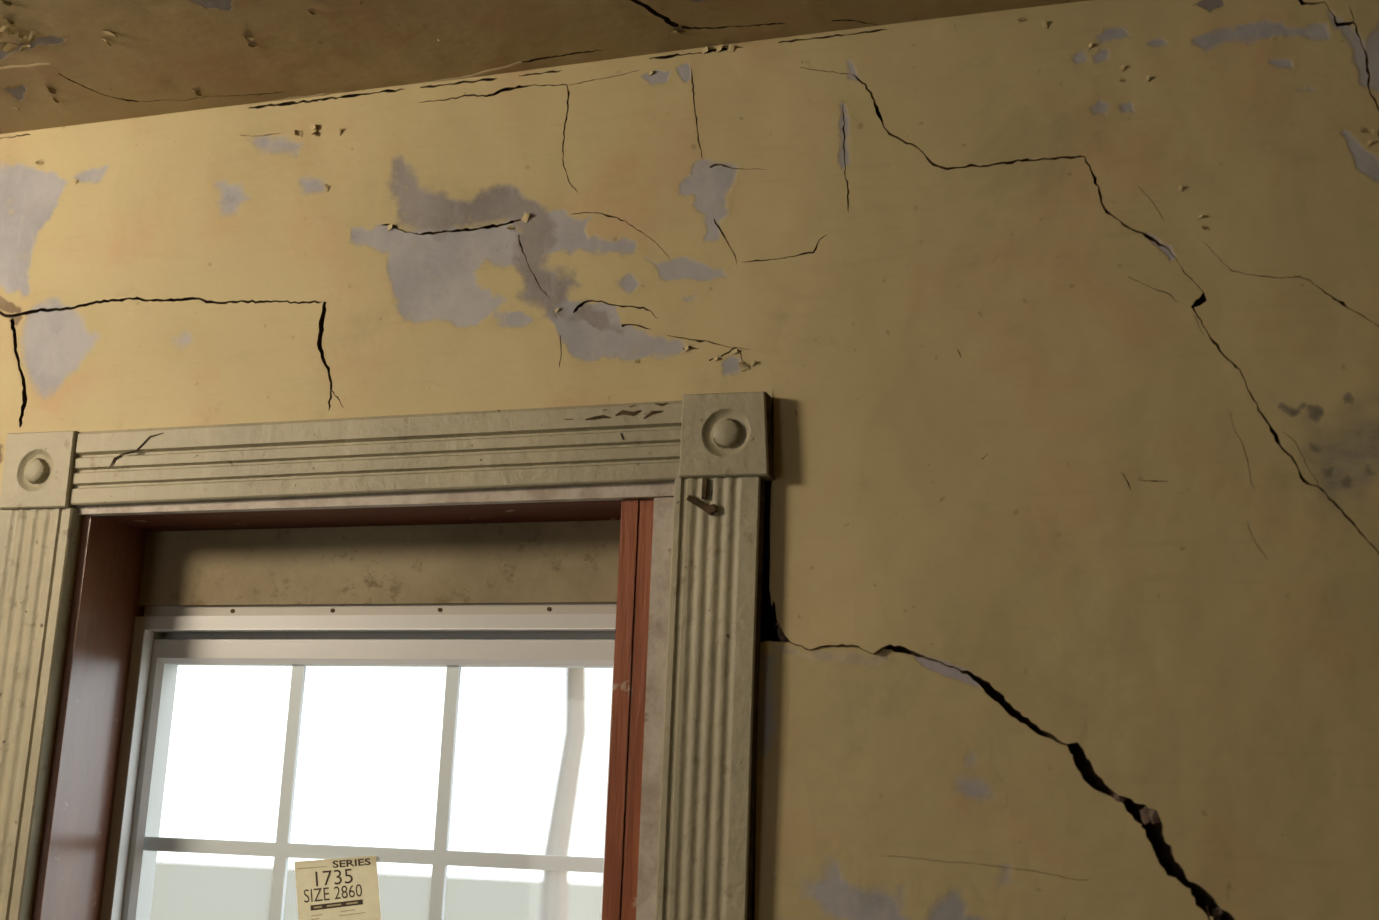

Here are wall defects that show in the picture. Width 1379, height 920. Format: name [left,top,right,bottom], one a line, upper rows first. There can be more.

peeling [0,1,117,62]
peeling [1184,0,1379,99]
peeling [0,155,114,410]
crack [0,297,344,428]
peeling [343,146,745,371]
crack [58,0,1379,554]
peeling [757,641,789,768]
crack [769,622,1235,920]